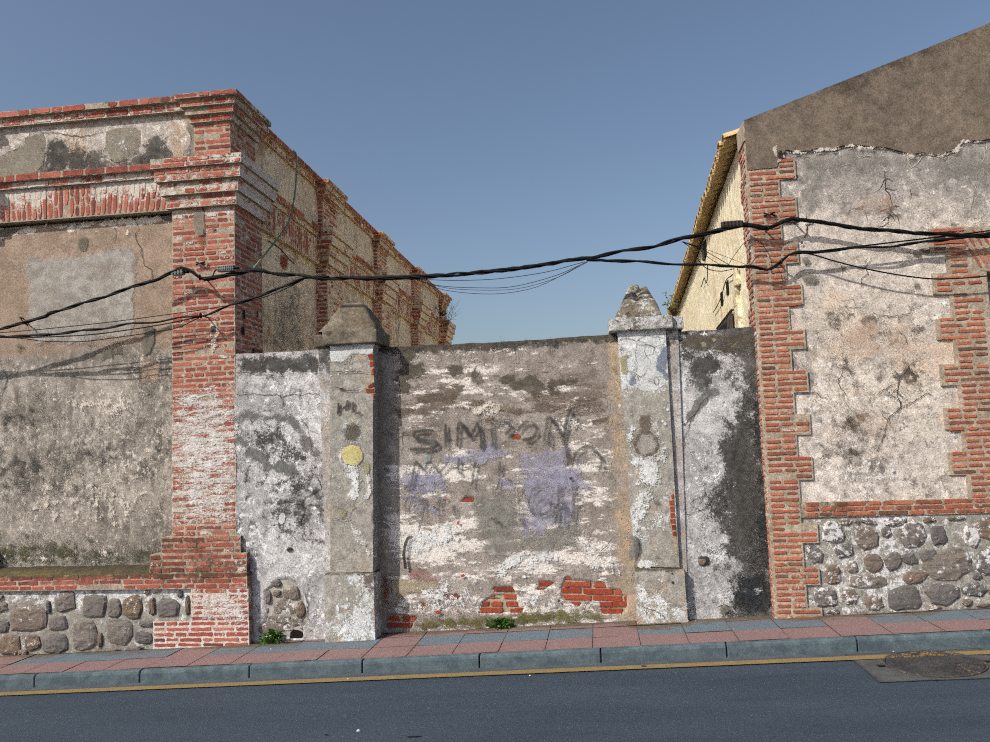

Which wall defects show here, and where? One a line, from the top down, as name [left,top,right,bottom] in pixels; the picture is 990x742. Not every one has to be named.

flaking render [777,143,875,162]
crack [823,147,924,227]
water stain [380,343,596,423]
water stain [443,336,611,355]
mould [680,331,756,400]
crack [835,258,932,451]
peeling [31,385,237,535]
water stain [245,415,323,538]
mould [704,369,772,617]
peeling [384,518,469,561]
spalling [386,530,690,627]
spalling [698,541,730,599]